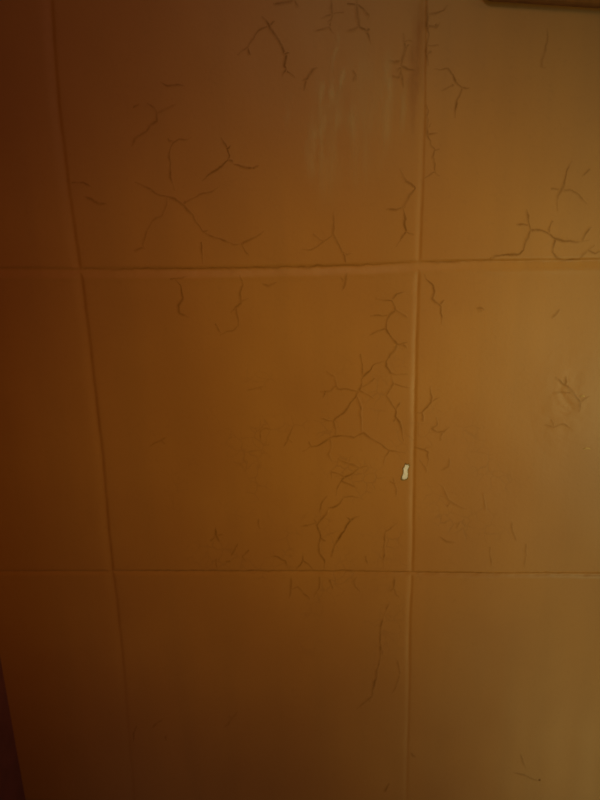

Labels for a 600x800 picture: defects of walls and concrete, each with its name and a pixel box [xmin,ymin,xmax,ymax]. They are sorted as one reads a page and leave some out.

crack [237,0,318,91]
crack [84,160,600,324]
crack [369,291,440,441]
peeling [401,463,410,481]